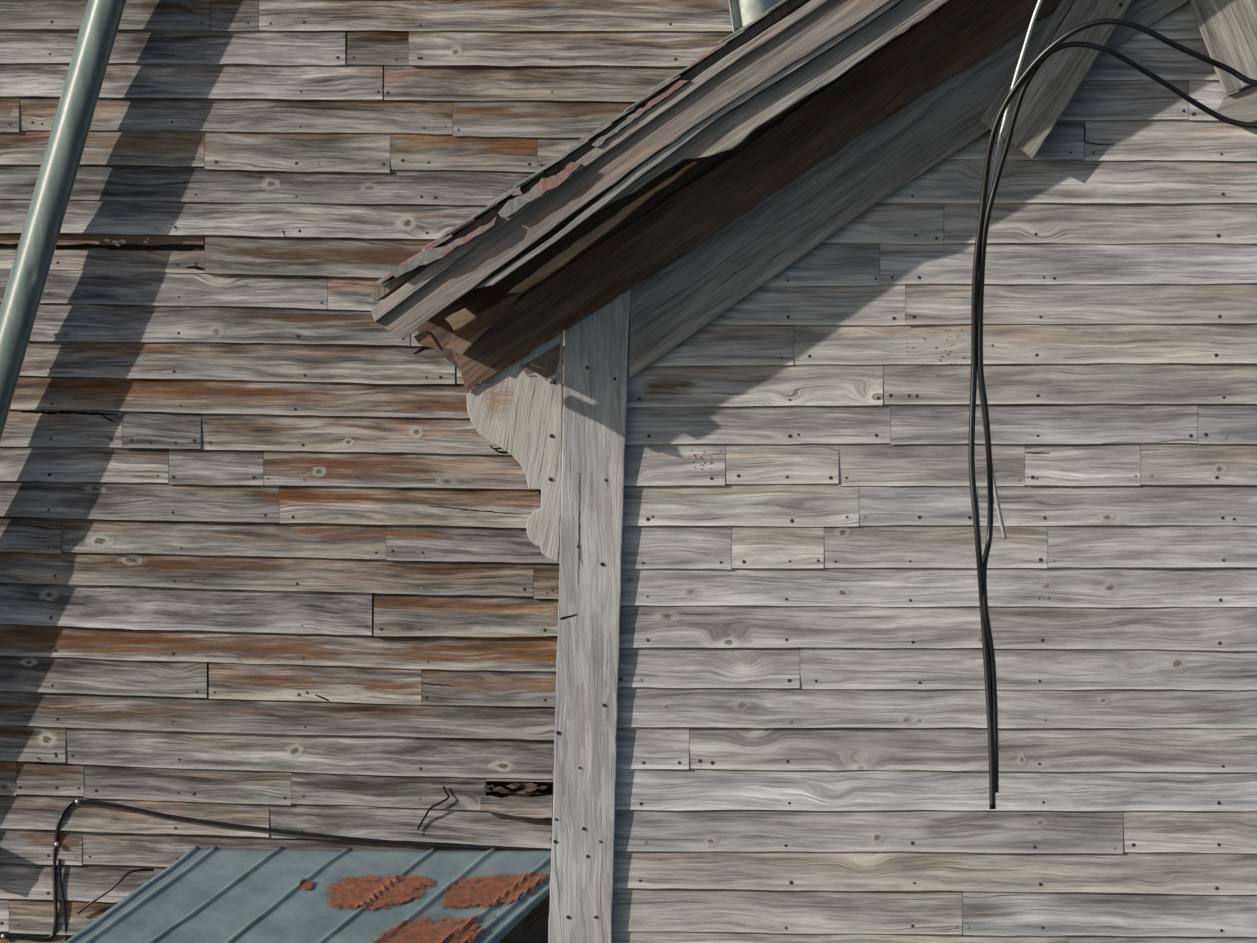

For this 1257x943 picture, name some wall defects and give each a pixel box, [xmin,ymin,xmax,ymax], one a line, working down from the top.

peeling [483,782,552,794]
corrosion [299,871,546,943]